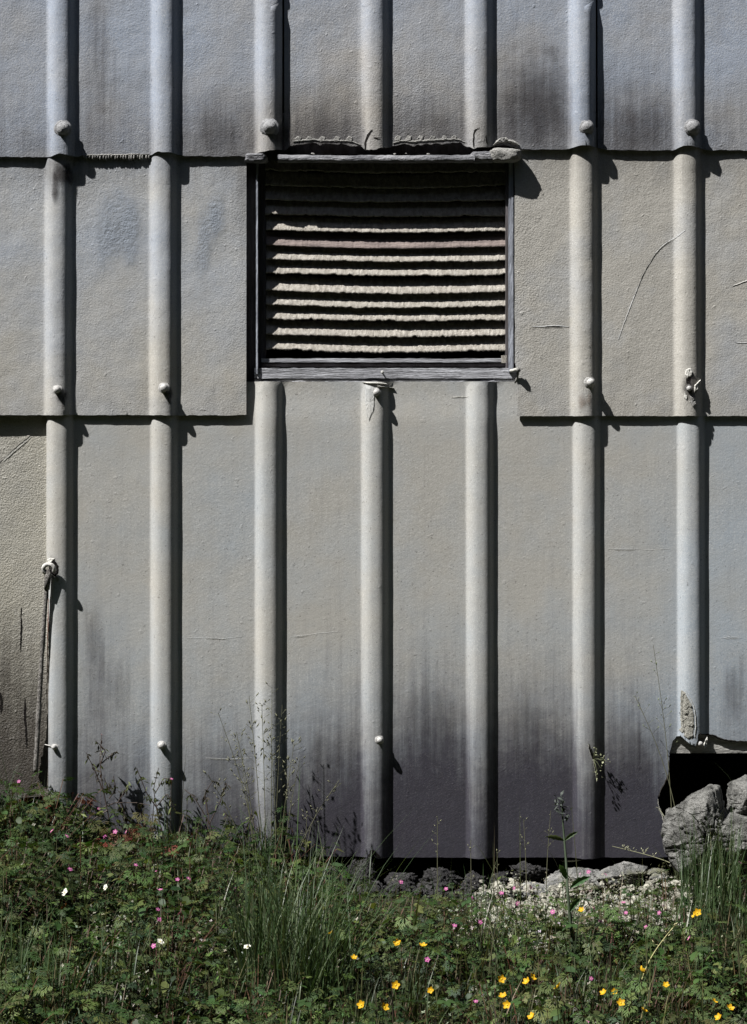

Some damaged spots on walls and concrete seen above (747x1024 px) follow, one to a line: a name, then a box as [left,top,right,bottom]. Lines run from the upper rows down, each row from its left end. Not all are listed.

crack [618,231,684,339]
spalling [679,690,747,749]